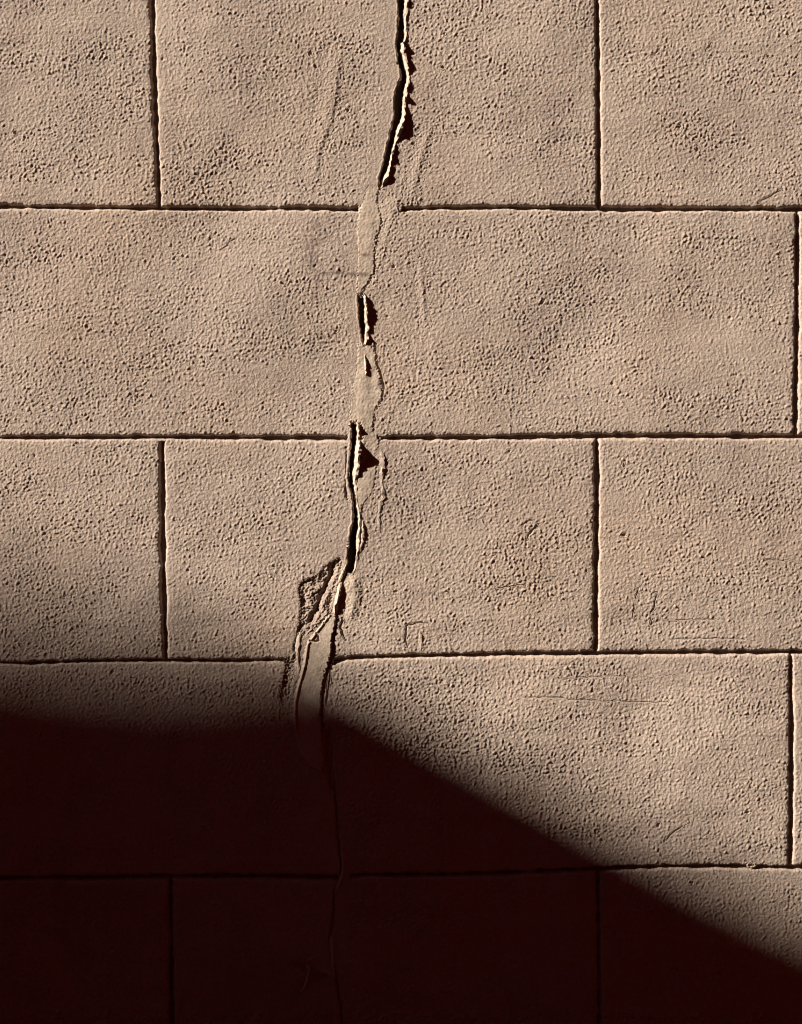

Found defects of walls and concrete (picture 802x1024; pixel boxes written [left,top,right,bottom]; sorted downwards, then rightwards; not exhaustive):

spalling [277,554,344,705]
crack [295,0,410,733]